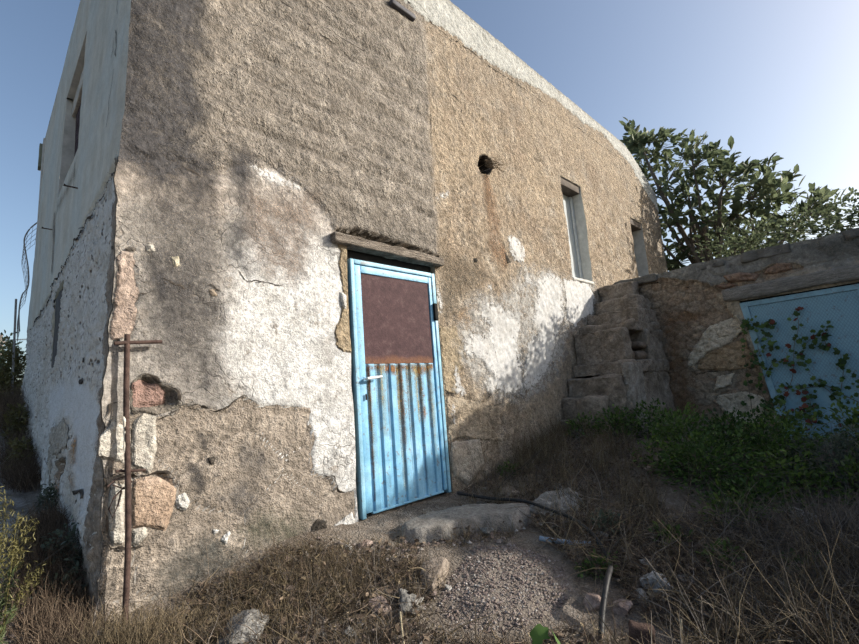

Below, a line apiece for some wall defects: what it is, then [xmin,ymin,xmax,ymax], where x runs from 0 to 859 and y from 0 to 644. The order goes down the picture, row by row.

water stain [116,0,215,357]
water stain [231,154,310,275]
peeling [72,156,356,626]
rust [367,364,433,430]
peeling [439,235,595,486]
peeling [688,315,765,425]